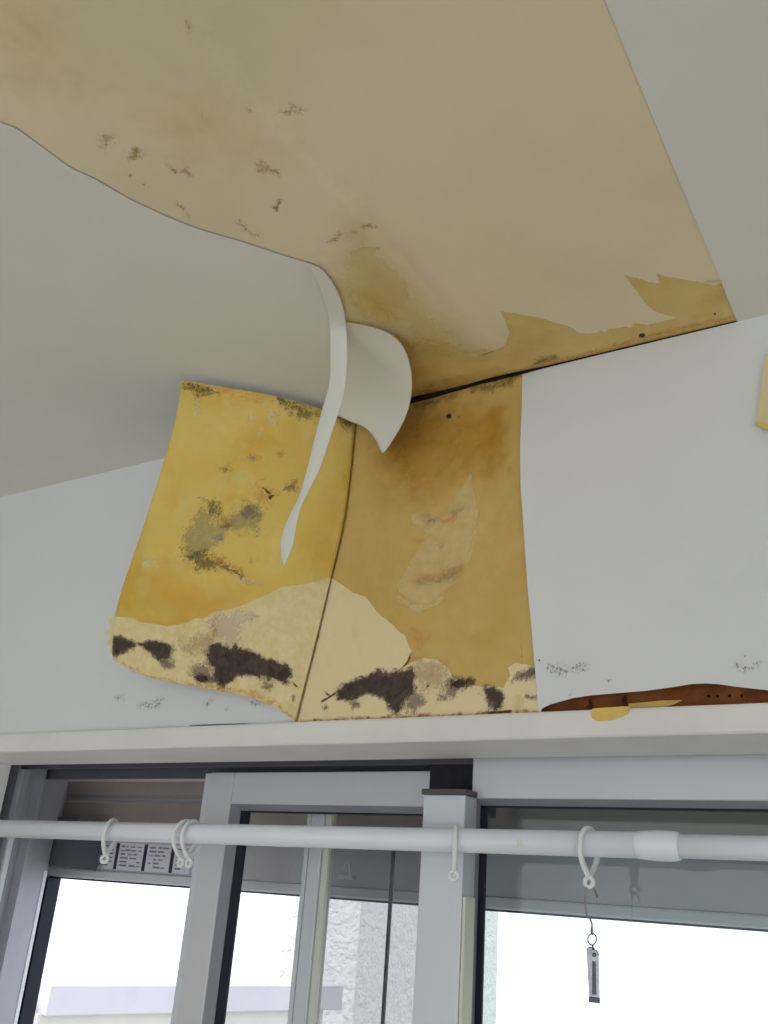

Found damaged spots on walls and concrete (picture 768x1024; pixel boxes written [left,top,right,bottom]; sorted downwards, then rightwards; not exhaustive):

peeling [0,0,768,722]
leakage [183,498,262,575]
leakage [112,635,174,669]
leakage [192,643,297,700]
leakage [321,667,429,716]
leakage [440,677,505,711]
leakage [512,663,585,681]